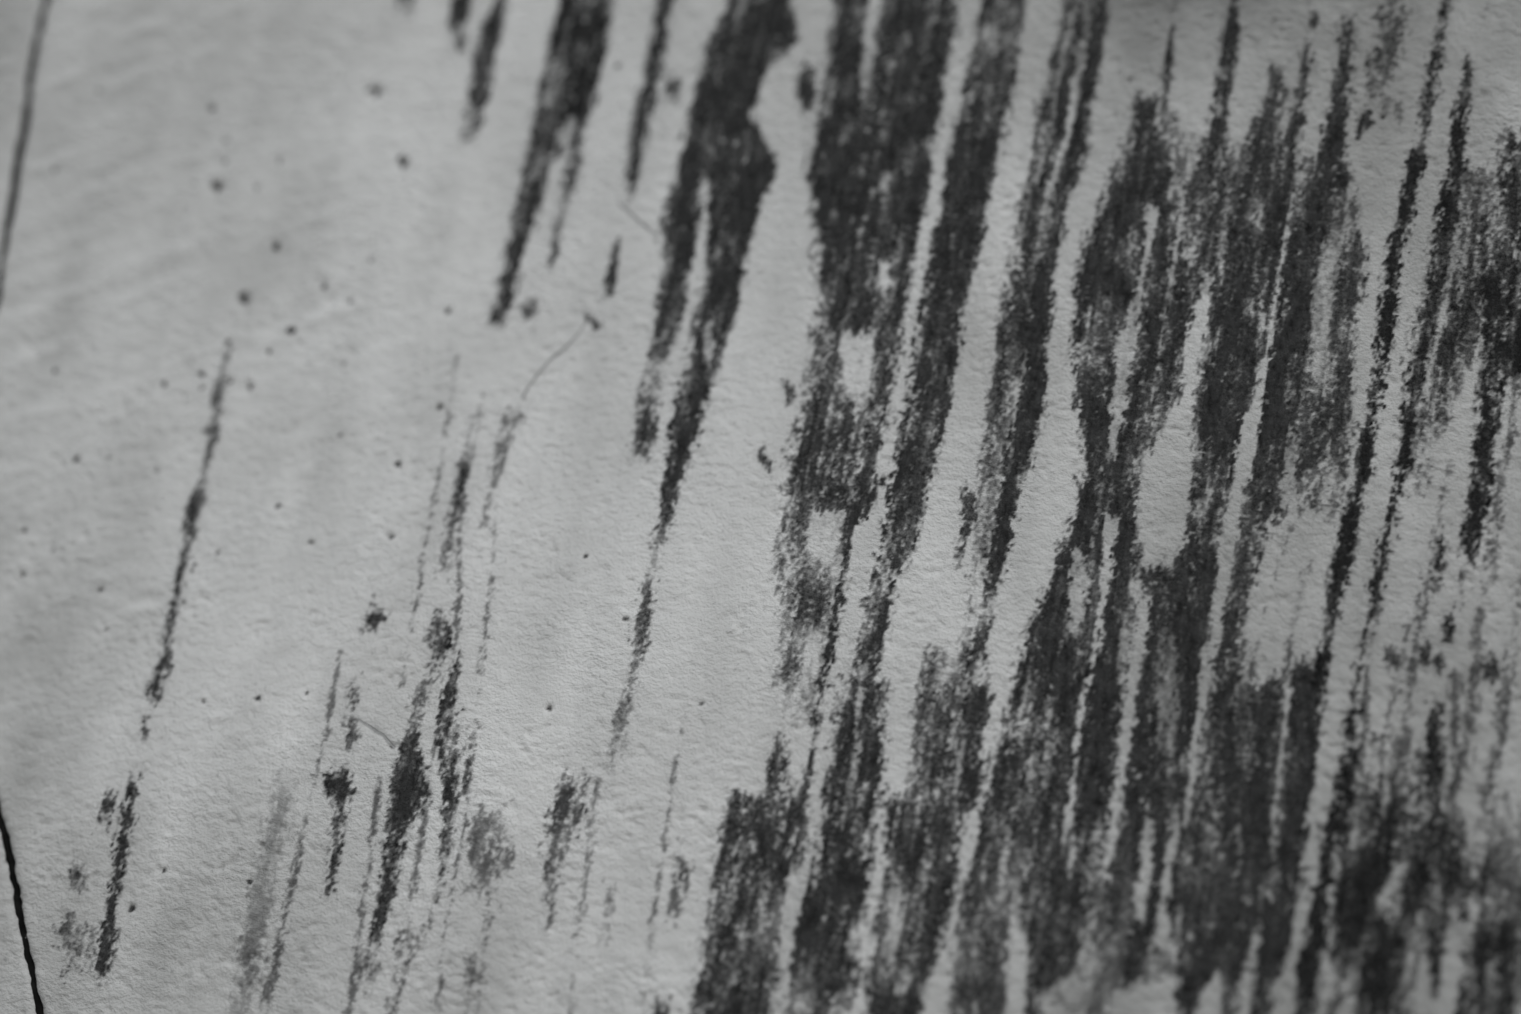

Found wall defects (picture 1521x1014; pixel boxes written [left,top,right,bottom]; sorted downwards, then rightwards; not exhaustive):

crack [0,0,49,300]
crack [0,807,44,1014]